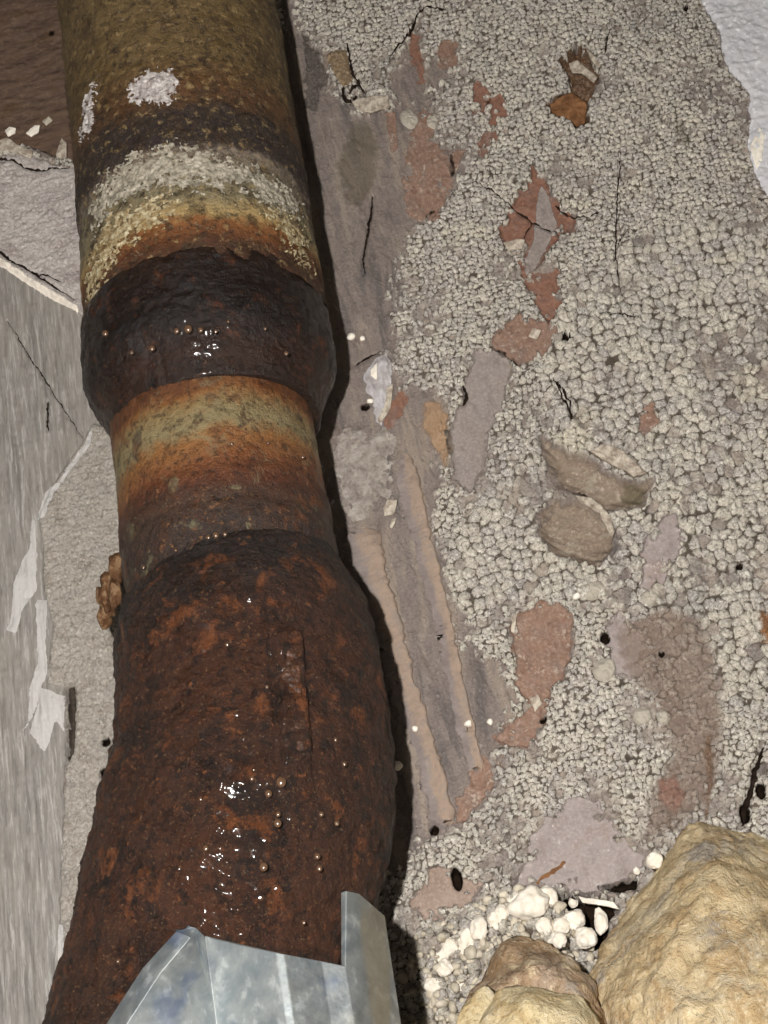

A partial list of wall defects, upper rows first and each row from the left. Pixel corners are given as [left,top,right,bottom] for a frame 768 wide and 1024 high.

crack [341,43,365,104]
crack [390,5,446,57]
spalling [546,46,601,128]
peeling [701,0,768,196]
crack [362,196,373,274]
crack [474,149,641,317]
crack [7,321,83,438]
peeling [333,351,409,529]
peeling [449,166,577,493]
peeling [0,258,100,1024]
crack [741,748,764,826]
spalling [465,797,768,1024]